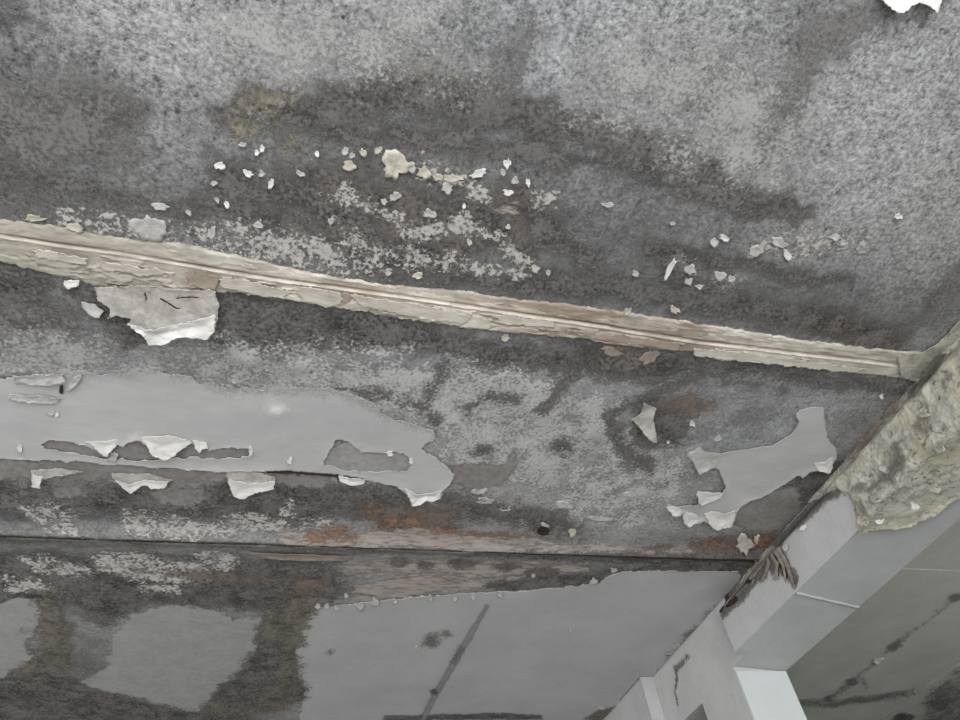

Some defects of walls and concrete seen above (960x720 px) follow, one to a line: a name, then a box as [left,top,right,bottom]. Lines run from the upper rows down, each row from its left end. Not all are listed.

peeling [882,0,942,13]
peeling [342,147,486,206]
damp [0,0,960,353]
peeling [129,203,170,242]
peeling [664,258,704,290]
peeling [0,261,518,511]
damp [0,292,907,551]
rust [354,498,462,533]
peeling [250,338,960,720]
damp [482,563,742,592]
damp [0,547,352,720]
mould [414,630,450,657]